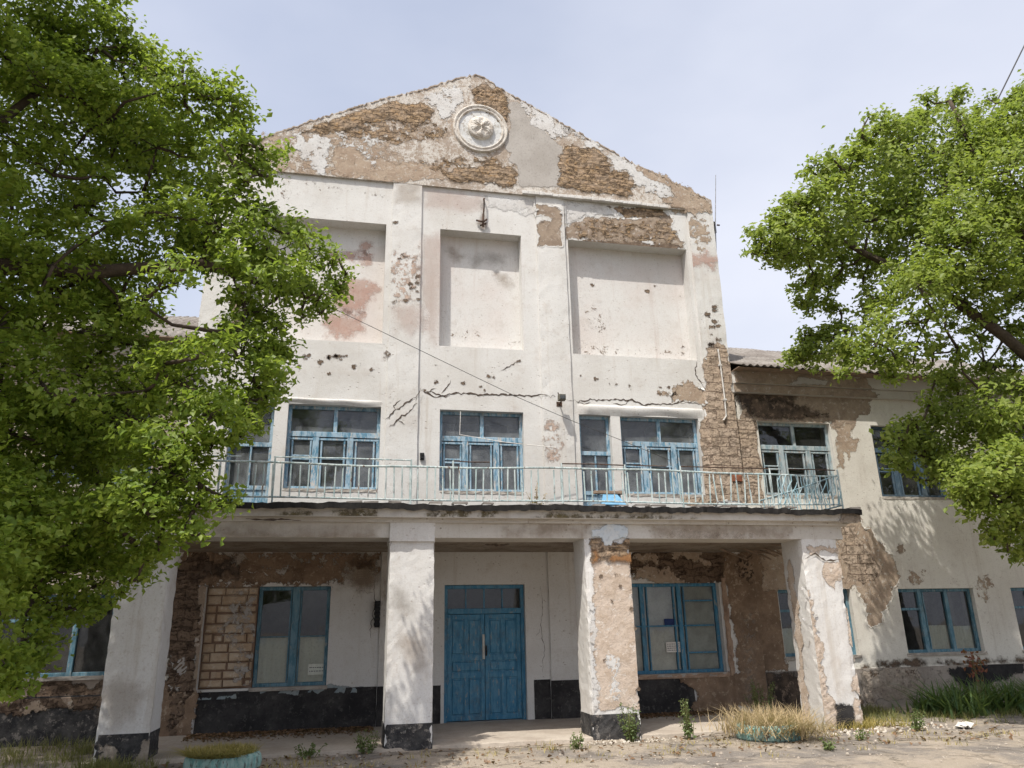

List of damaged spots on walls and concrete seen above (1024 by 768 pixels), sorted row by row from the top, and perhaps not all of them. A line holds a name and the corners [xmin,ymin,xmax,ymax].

flaking render [259,81,717,269]
crack [386,360,703,426]
flaking render [657,305,880,506]
flaking render [0,679,104,717]
spalling [99,744,118,761]
flaking render [134,552,381,765]
peeling [588,514,1024,729]